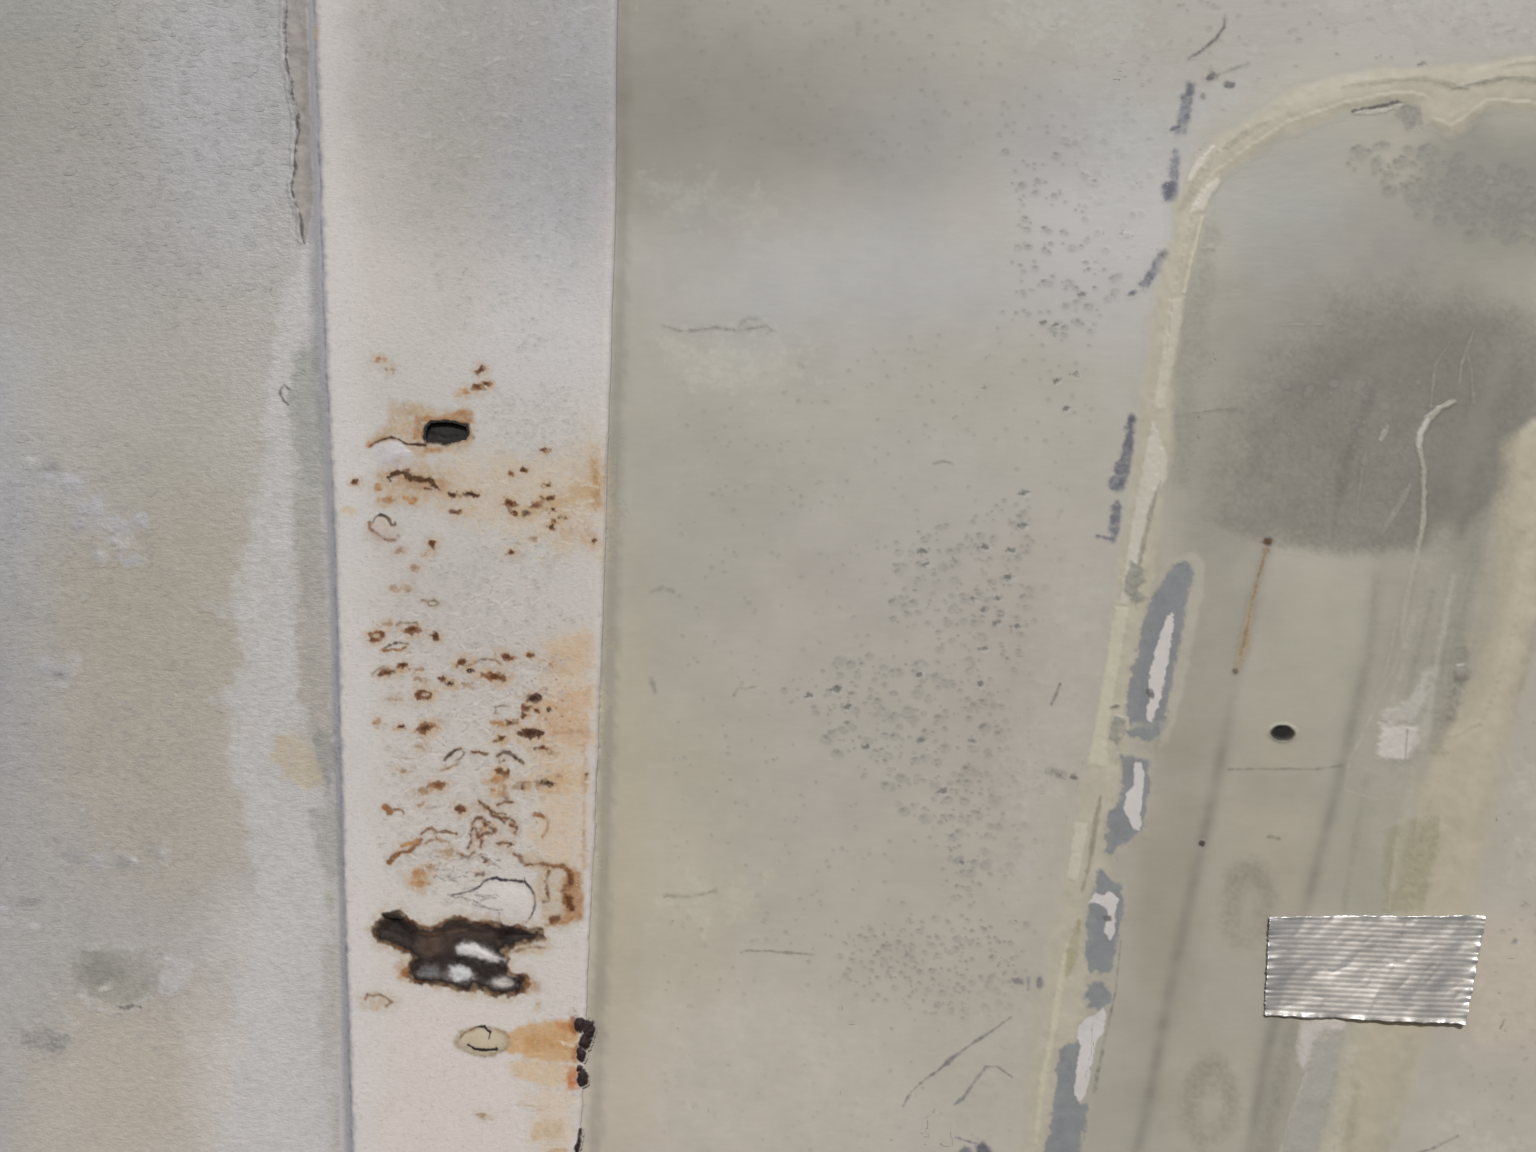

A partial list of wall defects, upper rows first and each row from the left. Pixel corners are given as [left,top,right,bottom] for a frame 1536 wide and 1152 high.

crack [277,0,306,246]
corrosion [344,351,629,1152]
peeling [1035,548,1208,1152]
corrosion [1231,536,1276,676]